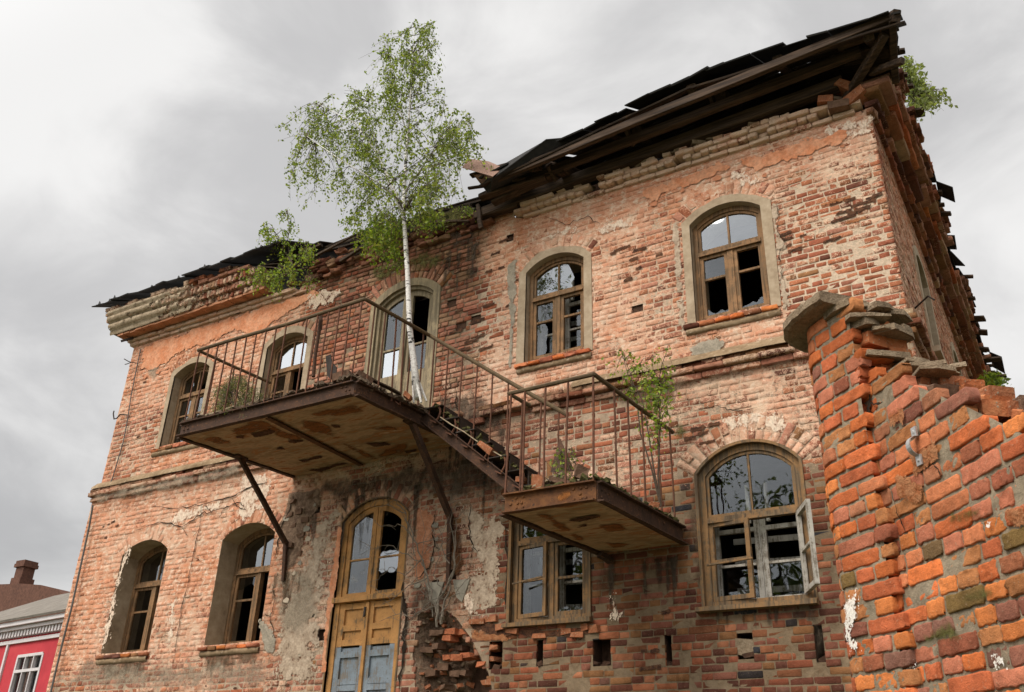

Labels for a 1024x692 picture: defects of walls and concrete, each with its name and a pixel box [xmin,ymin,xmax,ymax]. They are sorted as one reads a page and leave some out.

peeling [642,129,847,206]
peeling [141,289,340,383]
corrosion [205,406,363,444]
damp [321,446,499,546]
crack [138,481,271,667]
damp [272,572,301,613]
spalling [410,502,611,692]
damp [843,588,862,651]